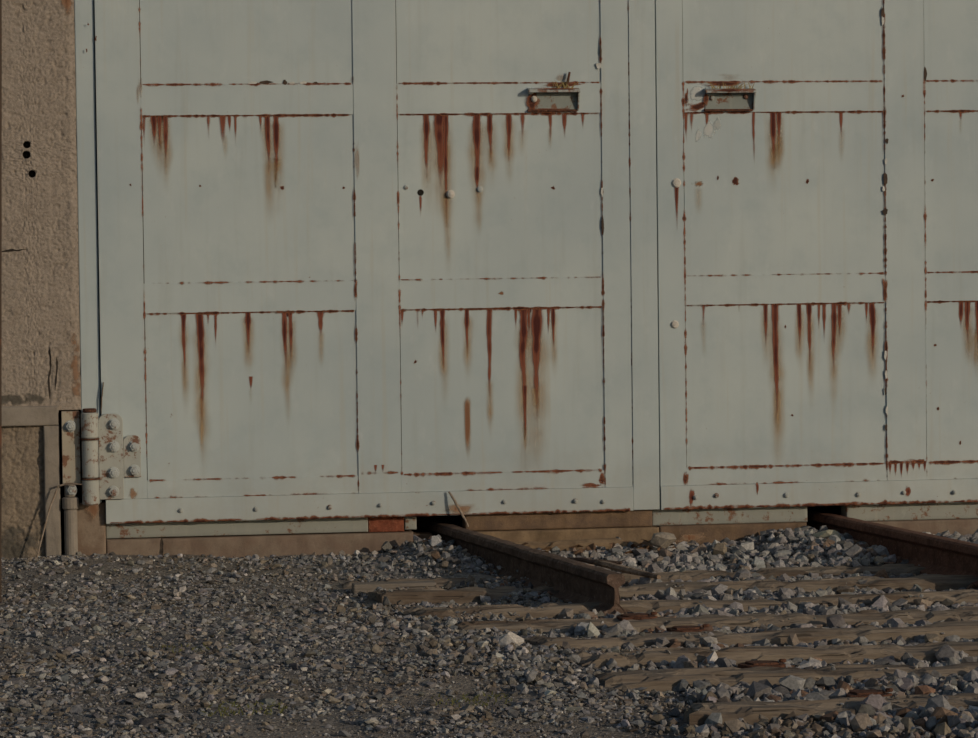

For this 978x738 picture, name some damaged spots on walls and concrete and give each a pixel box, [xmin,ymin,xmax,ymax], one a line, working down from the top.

corrosion [396,81,602,208]
corrosion [923,79,978,138]
corrosion [675,0,888,420]
corrosion [143,301,354,440]
corrosion [398,275,605,431]
corrosion [924,261,978,340]
corrosion [664,436,978,510]